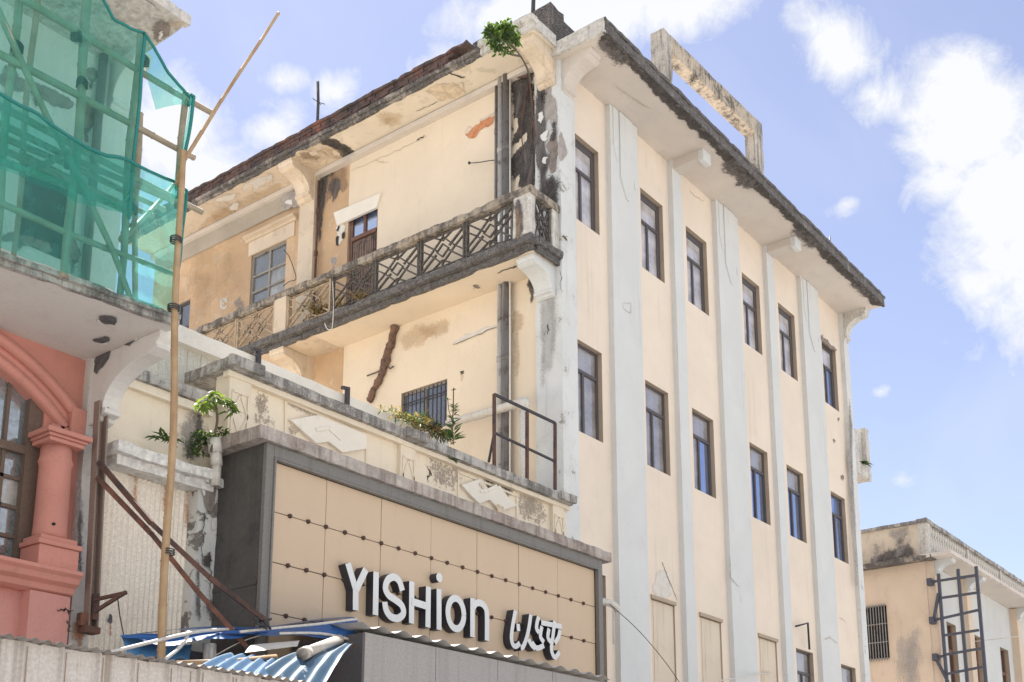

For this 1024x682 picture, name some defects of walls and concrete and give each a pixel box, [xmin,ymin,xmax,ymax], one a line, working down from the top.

flaking render [464,112,495,139]
peeling [538,87,567,198]
water stain [318,168,347,241]
spalling [93,316,117,374]
peeling [201,487,216,590]
water stain [871,528,914,563]